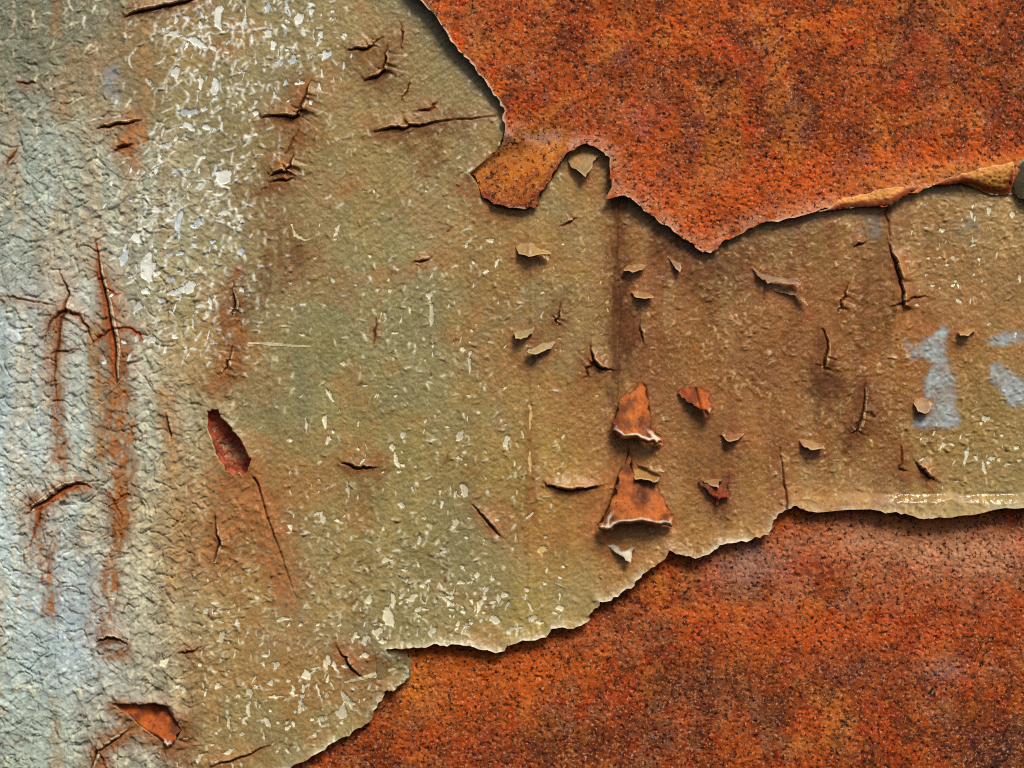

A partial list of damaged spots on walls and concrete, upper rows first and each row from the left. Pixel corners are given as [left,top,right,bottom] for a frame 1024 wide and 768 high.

crack [261,83,311,183]
crack [349,25,495,133]
peeling [420,0,1024,253]
crack [5,243,143,397]
rust [52,379,68,465]
rust [33,485,88,613]
crack [28,480,132,547]
rust [88,270,136,661]
peeling [598,382,675,531]
peeling [113,703,188,749]
spalling [195,547,564,768]
rust [291,506,1024,768]